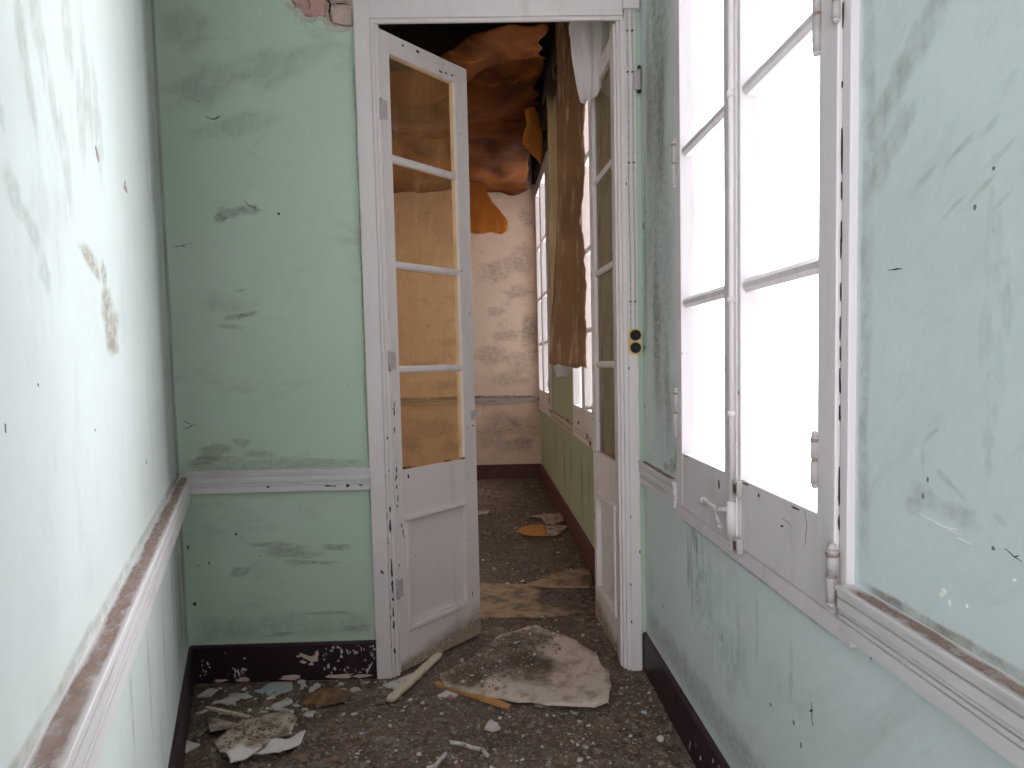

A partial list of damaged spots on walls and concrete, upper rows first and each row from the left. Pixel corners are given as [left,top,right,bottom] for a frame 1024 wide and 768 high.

flaking render [285,0,353,32]
peeling [200,657,250,682]
peeling [281,645,376,680]